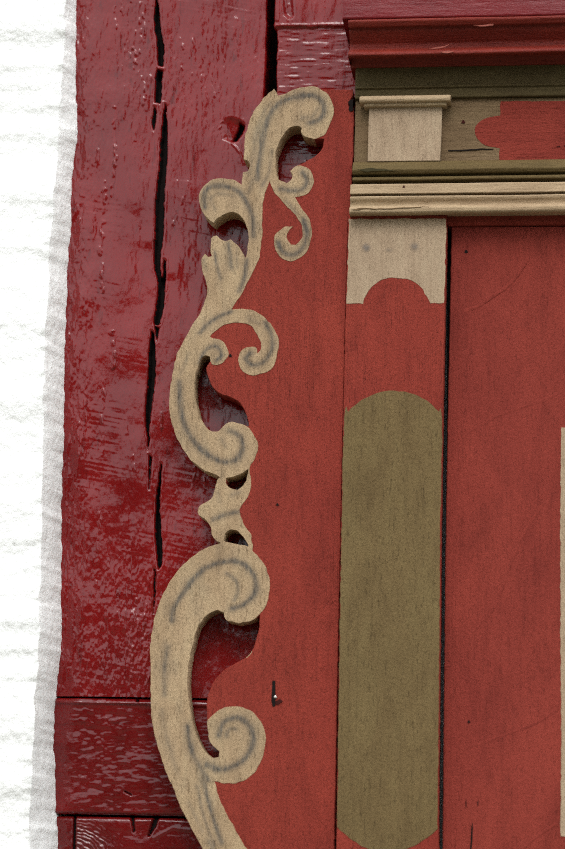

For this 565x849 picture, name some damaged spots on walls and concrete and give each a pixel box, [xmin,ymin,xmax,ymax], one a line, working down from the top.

crack [146,0,168,604]